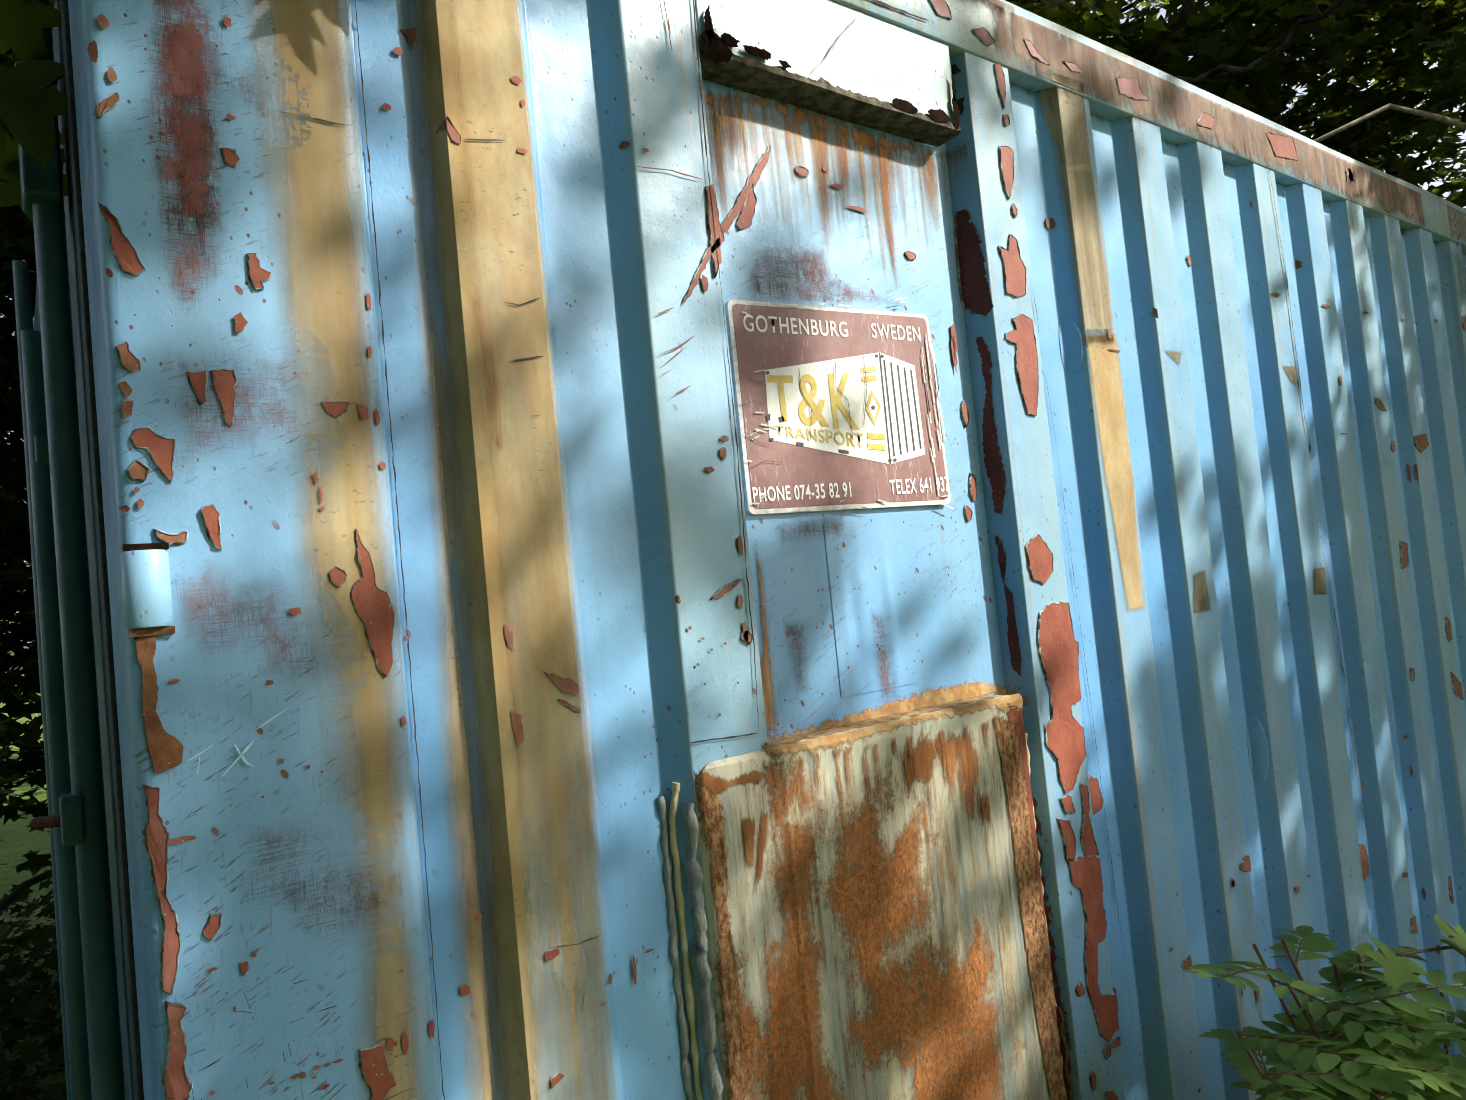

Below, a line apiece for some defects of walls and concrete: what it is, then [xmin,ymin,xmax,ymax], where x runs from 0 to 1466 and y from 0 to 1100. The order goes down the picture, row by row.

peeling [97,202,146,277]
peeling [682,145,771,304]
corrosion [702,76,946,272]
peeling [928,0,952,20]
peeling [951,146,1039,522]
peeling [993,64,1010,127]
corrosion [983,0,1425,453]
peeling [141,784,196,1100]
peeling [328,529,407,678]
corrosion [694,559,1071,1100]
peeling [995,533,1121,1100]
corrosion [1321,547,1379,932]